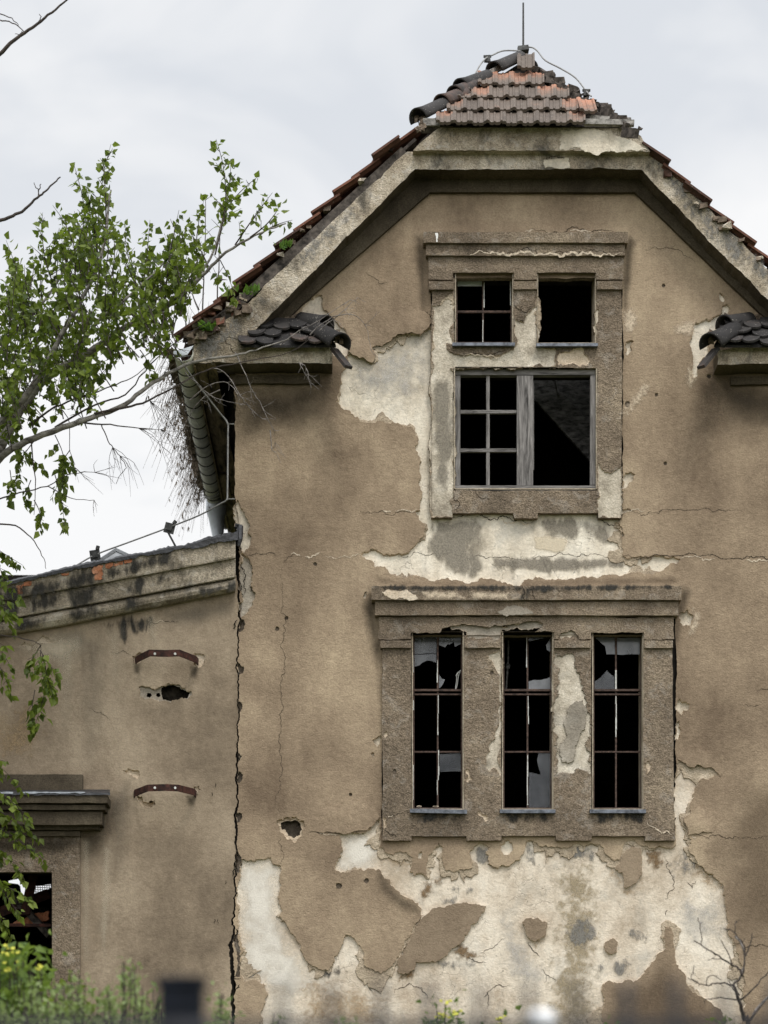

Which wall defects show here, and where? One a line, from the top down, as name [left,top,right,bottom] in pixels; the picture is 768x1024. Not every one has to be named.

flaking render [689,293,730,379]
flaking render [300,294,680,601]
crack [600,508,734,526]
water stain [3,572,96,630]
water stain [108,552,171,642]
spalling [139,683,192,703]
crack [232,545,357,812]
flaking render [550,653,592,776]
crack [647,822,759,839]
crack [214,814,241,1020]
flaking render [232,760,746,1020]